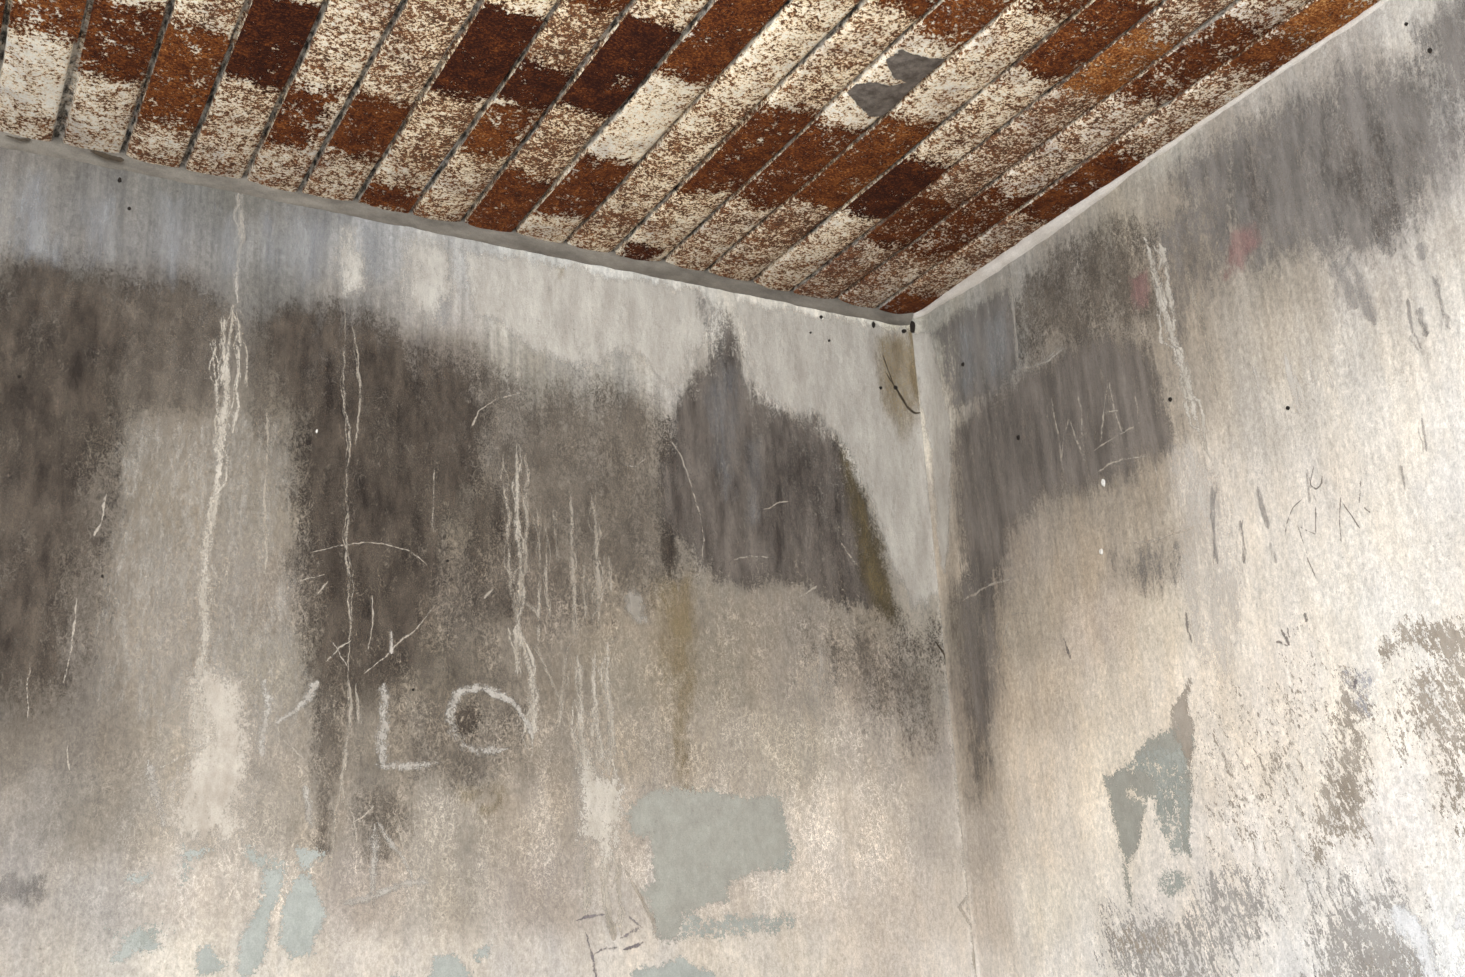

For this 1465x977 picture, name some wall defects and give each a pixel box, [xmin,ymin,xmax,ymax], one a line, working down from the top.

rust [0,0,787,232]
rust [618,240,670,261]
peeling [847,49,946,117]
rust [677,103,1155,261]
rust [865,0,1378,107]
damp [937,0,1465,780]
damp [0,179,944,941]
peeling [1094,607,1465,977]
peeling [97,917,176,965]
peeling [194,844,328,977]
peeling [424,944,493,977]
peeling [624,786,798,977]